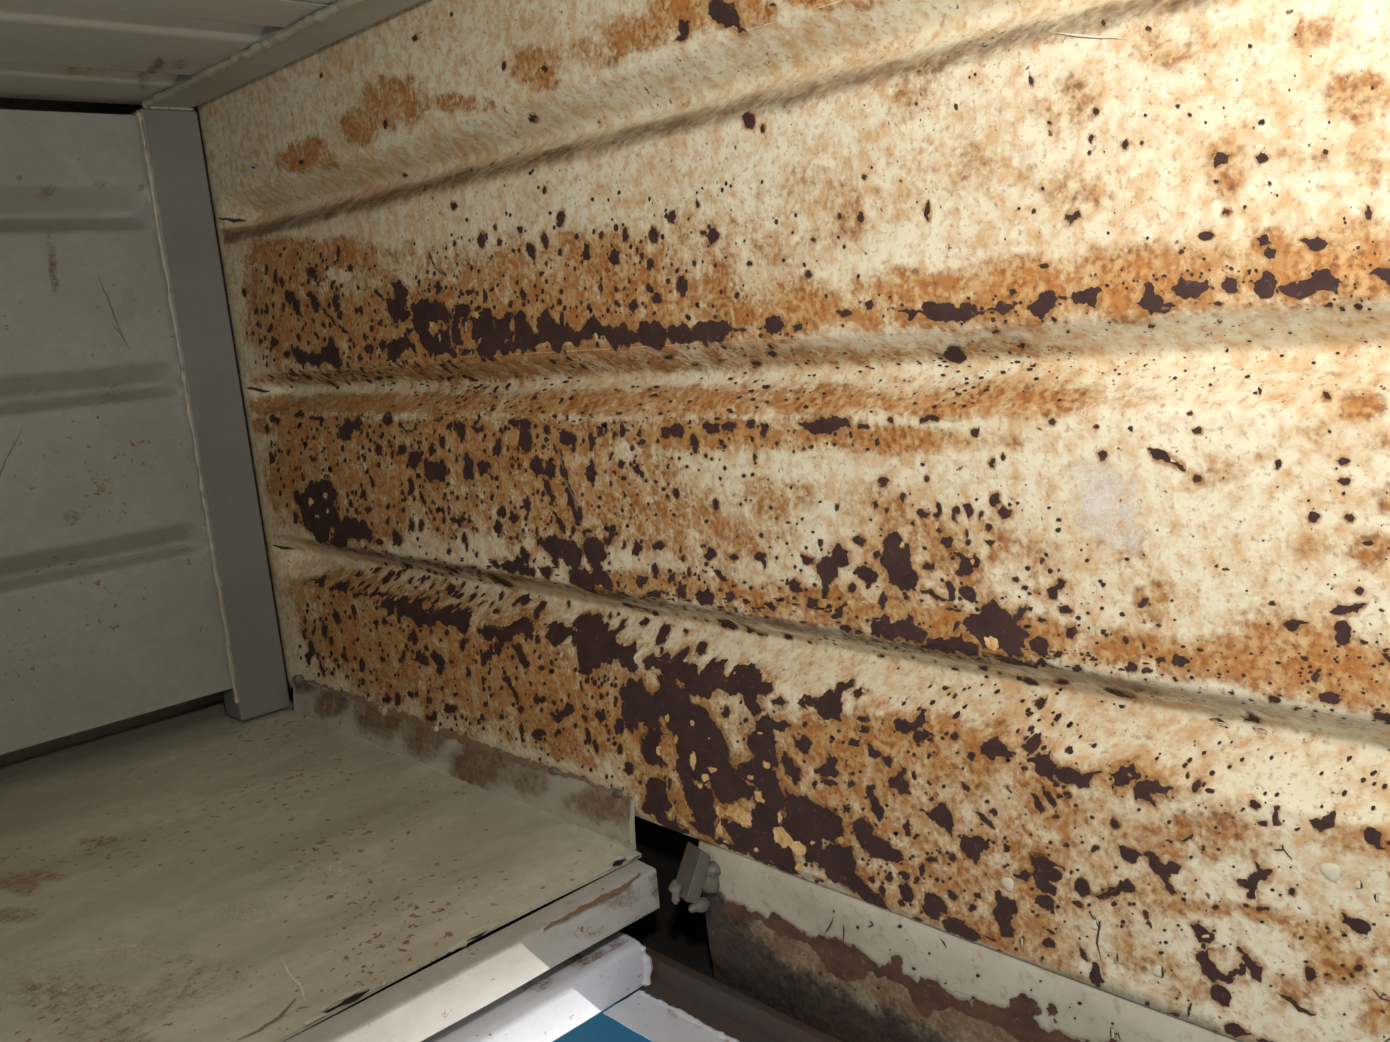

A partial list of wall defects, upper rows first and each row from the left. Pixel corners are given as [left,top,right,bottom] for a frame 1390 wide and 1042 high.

peeling [674,18,690,42]
rust [511,0,874,91]
peeling [708,0,749,37]
rust [341,75,495,146]
peeling [742,111,766,134]
peeling [1087,134,1144,155]
rust [1325,73,1389,124]
peeling [1213,152,1247,217]
rust [222,146,1390,862]
peeling [240,178,1390,1042]
water stain [304,679,633,801]
rust [721,704,1390,1042]